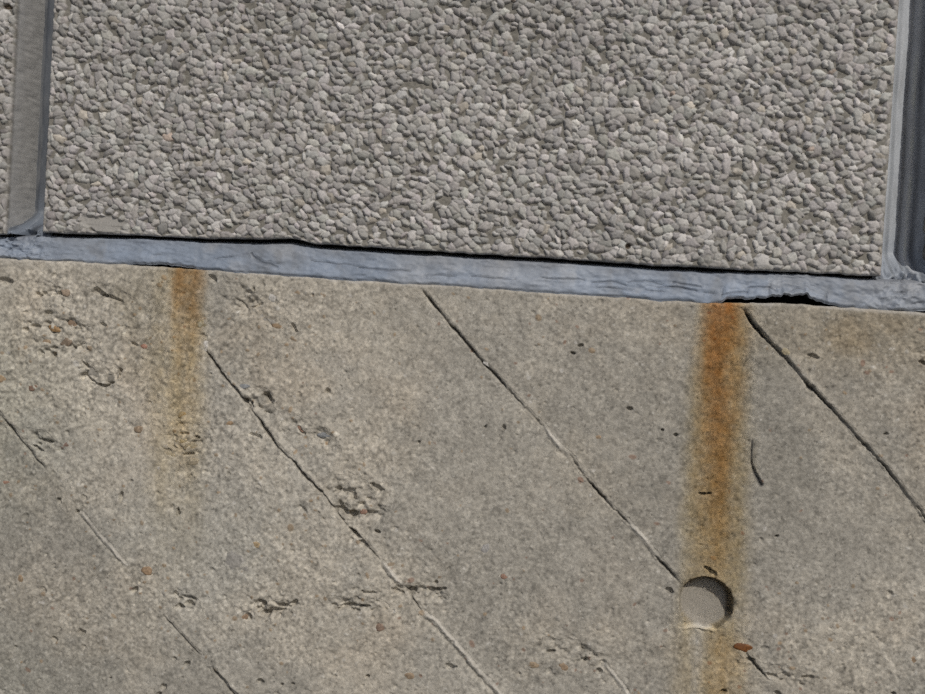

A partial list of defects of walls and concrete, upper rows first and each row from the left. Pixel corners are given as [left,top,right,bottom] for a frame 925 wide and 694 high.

crack [247,401,258,421]
crack [505,386,546,430]
crack [276,445,291,461]
crack [567,453,588,481]
crack [323,494,383,564]
crack [615,507,630,526]
crack [402,583,426,615]